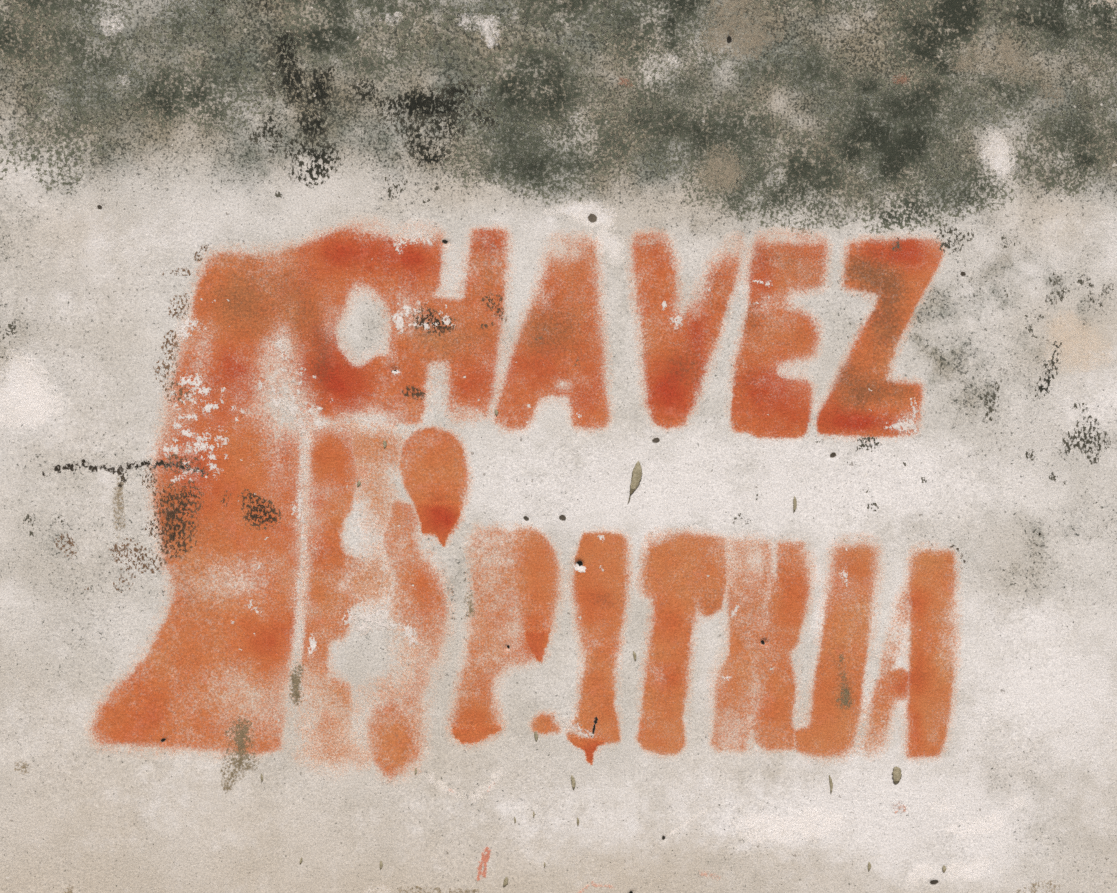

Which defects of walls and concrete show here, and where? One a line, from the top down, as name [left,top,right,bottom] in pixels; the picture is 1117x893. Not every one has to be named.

damp [0,0,1117,254]